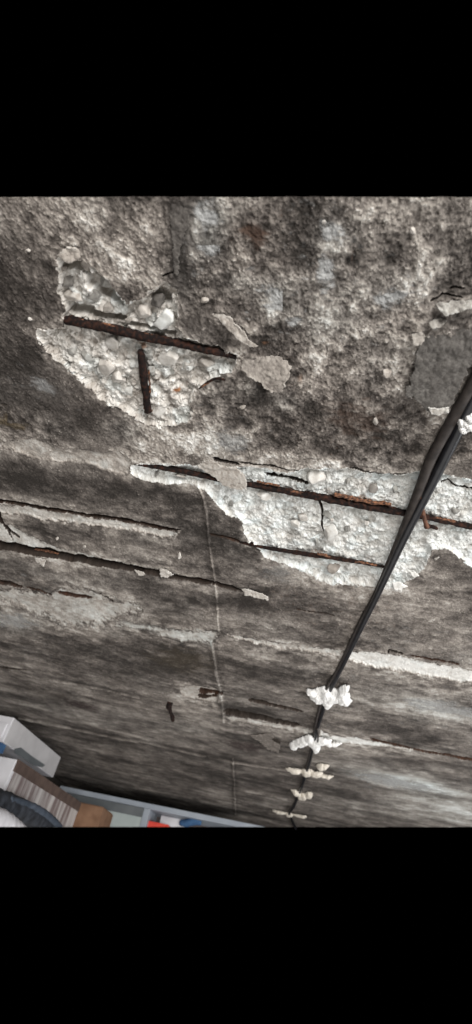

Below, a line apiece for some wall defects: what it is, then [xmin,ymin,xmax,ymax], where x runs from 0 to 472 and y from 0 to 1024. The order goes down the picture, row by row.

spalling [36,246,292,430]
crack [0,580,114,602]
crack [0,499,242,591]
spalling [0,436,472,590]